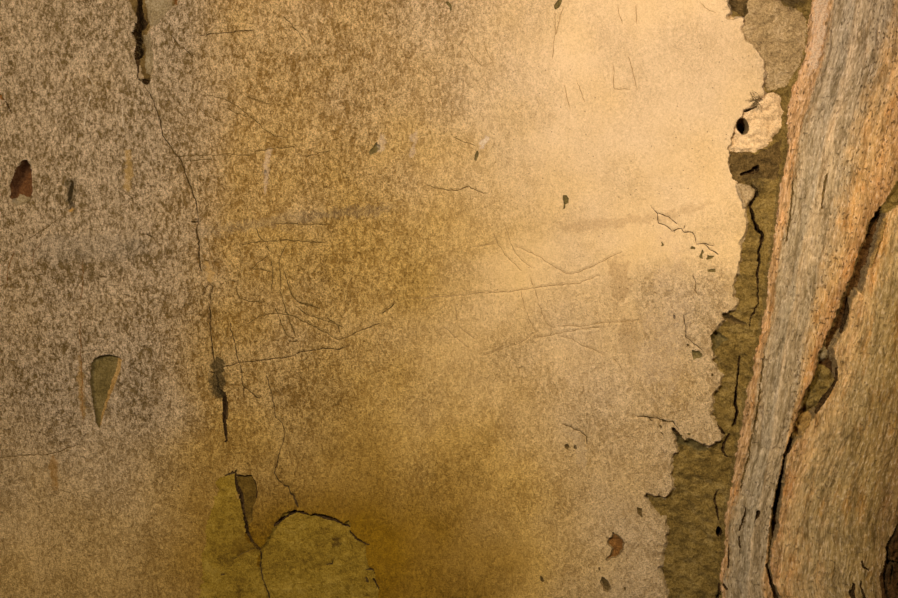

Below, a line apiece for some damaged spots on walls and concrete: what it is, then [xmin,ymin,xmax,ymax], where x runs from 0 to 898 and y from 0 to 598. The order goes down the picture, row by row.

flaking render [878,181,898,214]
crack [132,0,348,507]
crack [654,210,718,254]
flaking render [637,0,812,598]
flaking render [90,354,122,428]
crack [221,548,270,598]
flaking render [198,469,380,598]
flaking render [598,532,625,592]
spalling [848,580,866,598]